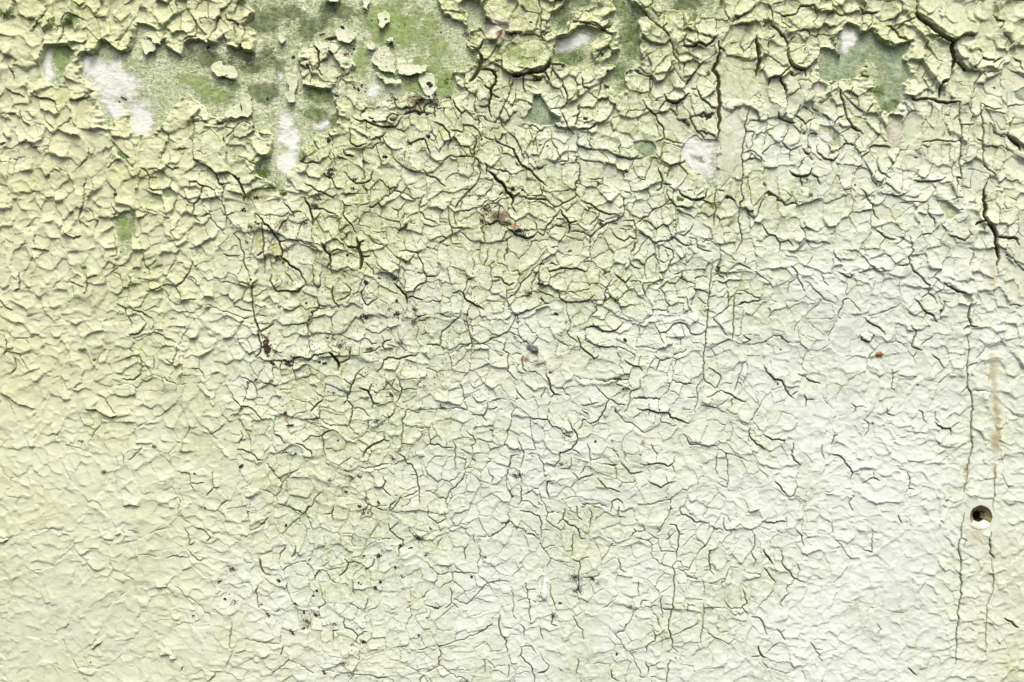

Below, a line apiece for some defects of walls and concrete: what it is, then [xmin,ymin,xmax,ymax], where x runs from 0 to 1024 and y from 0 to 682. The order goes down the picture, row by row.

damp [179,39,302,175]
peeling [42,0,485,195]
damp [235,2,387,53]
damp [311,116,331,143]
damp [353,81,453,112]
peeling [502,0,671,94]
peeling [656,0,719,22]
crack [712,48,721,128]
peeling [789,25,908,149]
crack [916,15,965,103]
crack [494,175,514,204]
crack [975,184,1016,264]